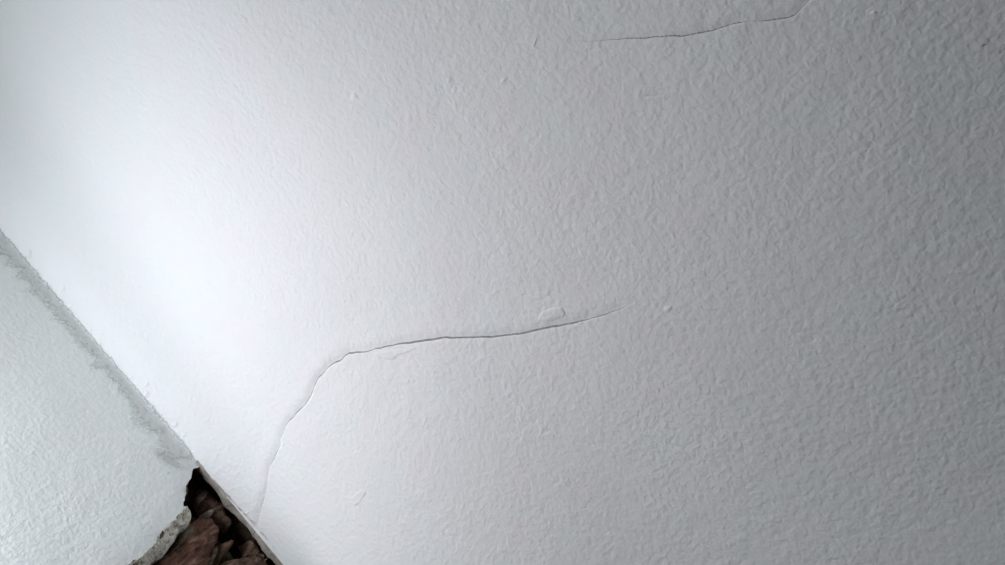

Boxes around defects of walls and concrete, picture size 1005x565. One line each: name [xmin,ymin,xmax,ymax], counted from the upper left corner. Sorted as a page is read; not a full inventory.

crack [0,221,195,459]
spalling [129,460,283,565]
crack [257,294,652,532]